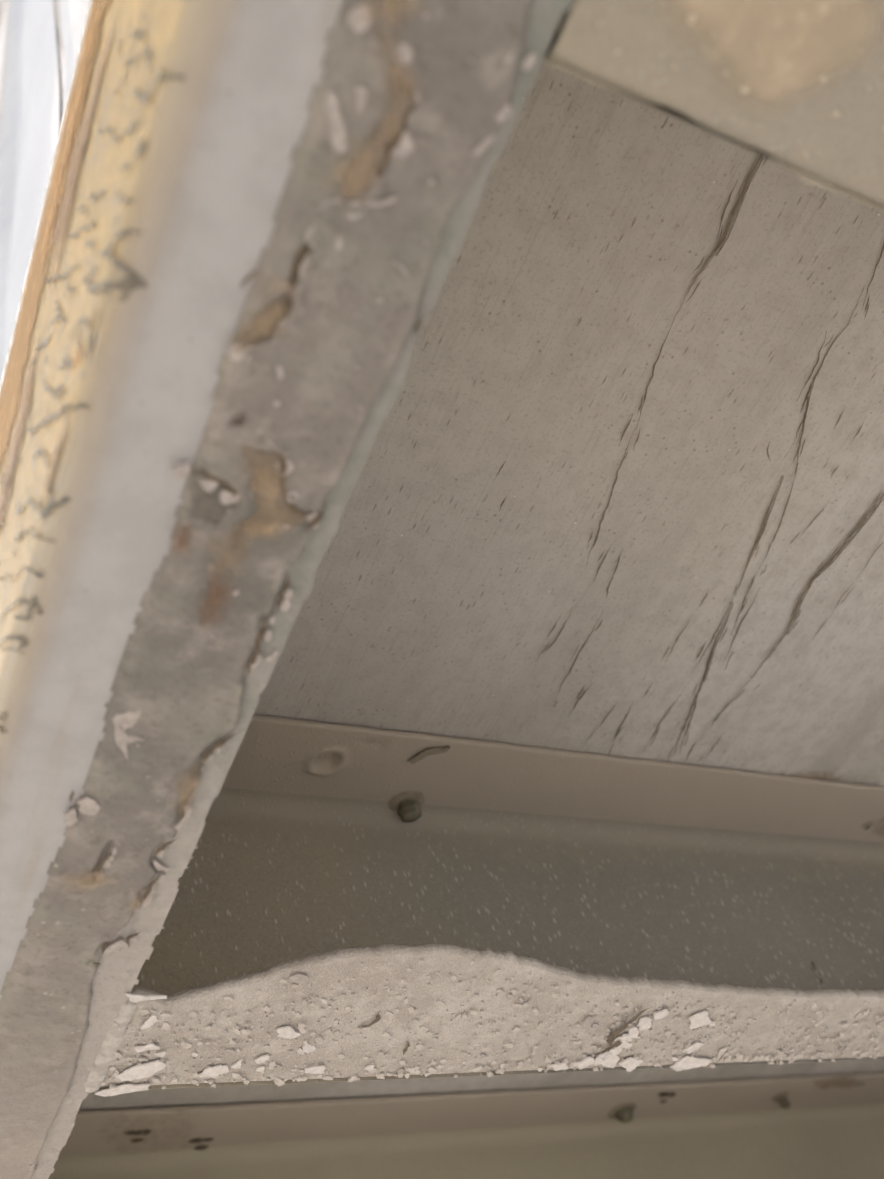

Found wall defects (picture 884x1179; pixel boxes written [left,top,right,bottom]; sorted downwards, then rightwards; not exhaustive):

peeling [347,4,372,34]
spalling [321,42,420,220]
spalling [227,226,315,376]
crack [538,155,768,716]
spalling [171,462,253,506]
spalling [237,439,324,533]
crack [587,243,884,763]
peeling [113,710,156,760]
peeling [408,745,450,764]
peeling [64,797,101,832]
peeling [139,860,168,913]
peeling [95,958,884,1097]